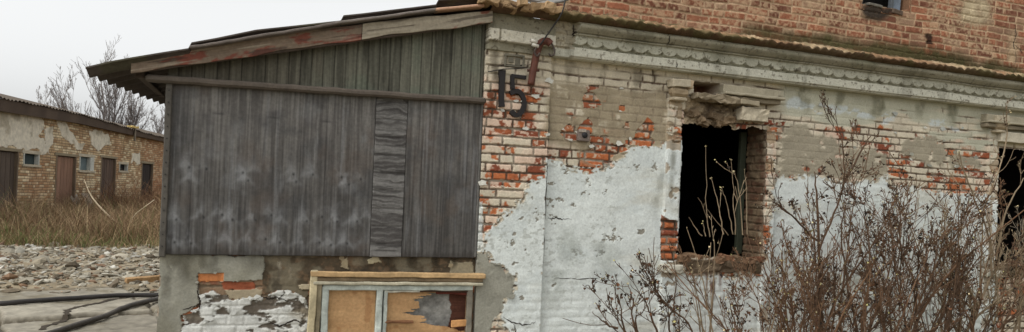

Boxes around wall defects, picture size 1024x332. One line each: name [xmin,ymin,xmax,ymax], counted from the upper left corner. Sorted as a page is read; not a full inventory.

peeling [0,112,111,155]
peeling [478,77,671,300]
peeling [770,94,985,195]
peeling [181,272,309,332]